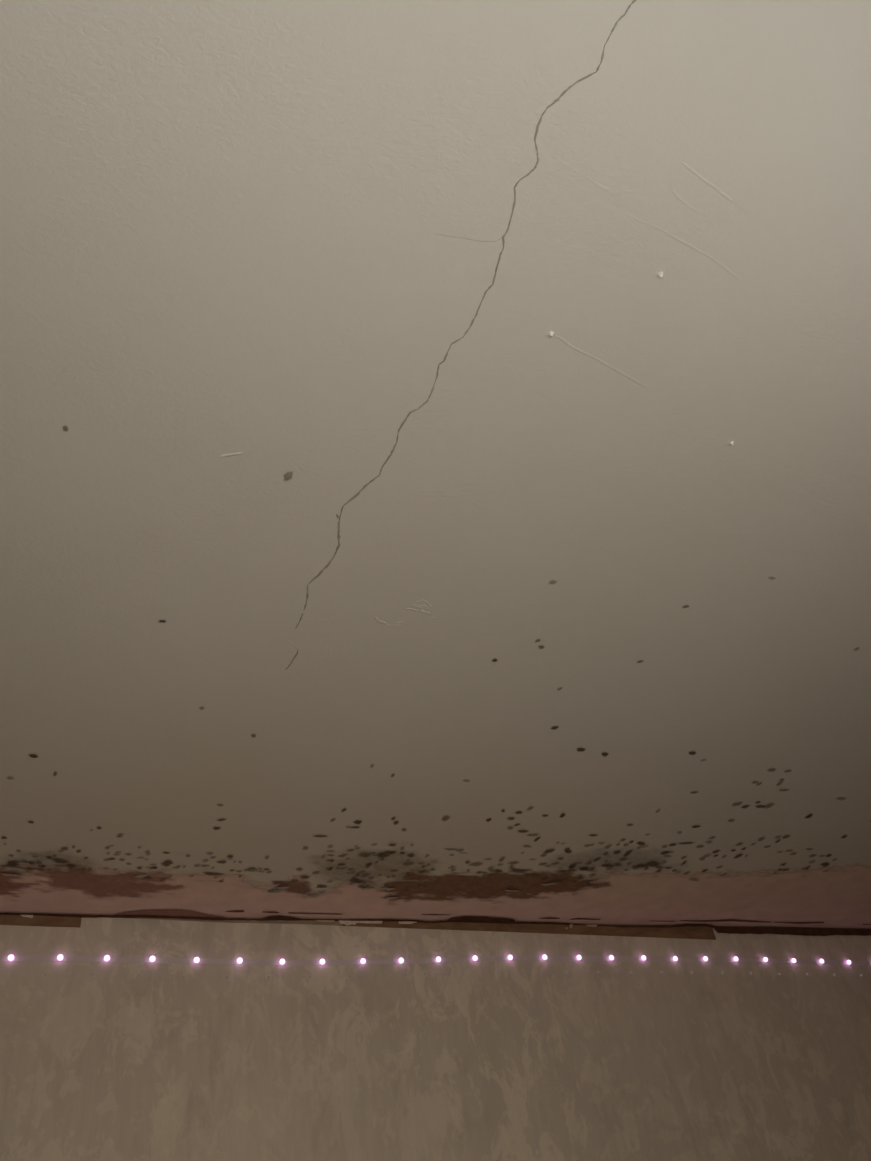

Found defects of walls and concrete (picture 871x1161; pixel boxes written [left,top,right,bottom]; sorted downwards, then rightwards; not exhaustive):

crack [286,0,637,669]
leakage [0,850,182,897]
leakage [264,869,326,894]
leakage [385,809,644,900]